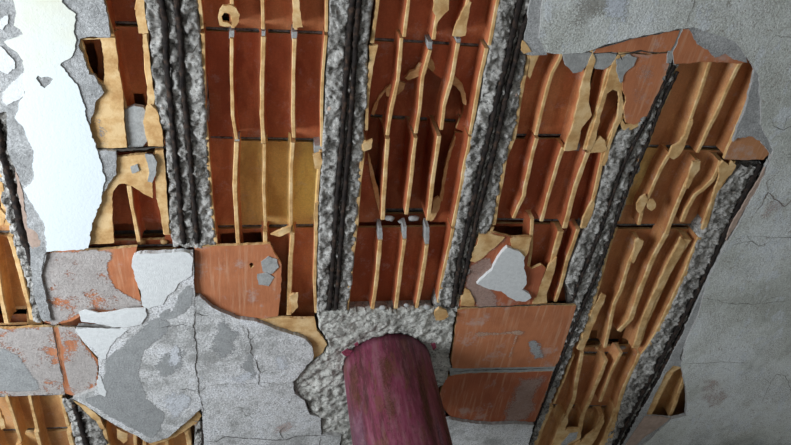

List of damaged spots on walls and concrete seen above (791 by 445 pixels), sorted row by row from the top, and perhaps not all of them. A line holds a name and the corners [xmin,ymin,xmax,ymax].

spalling [144,0,216,248]
spalling [293,0,547,445]
corrosion [543,63,674,407]
spalling [528,27,772,445]
peeling [62,286,193,445]
spalling [194,419,204,445]
crack [161,306,285,413]
peeling [210,321,239,360]
crack [206,428,324,445]